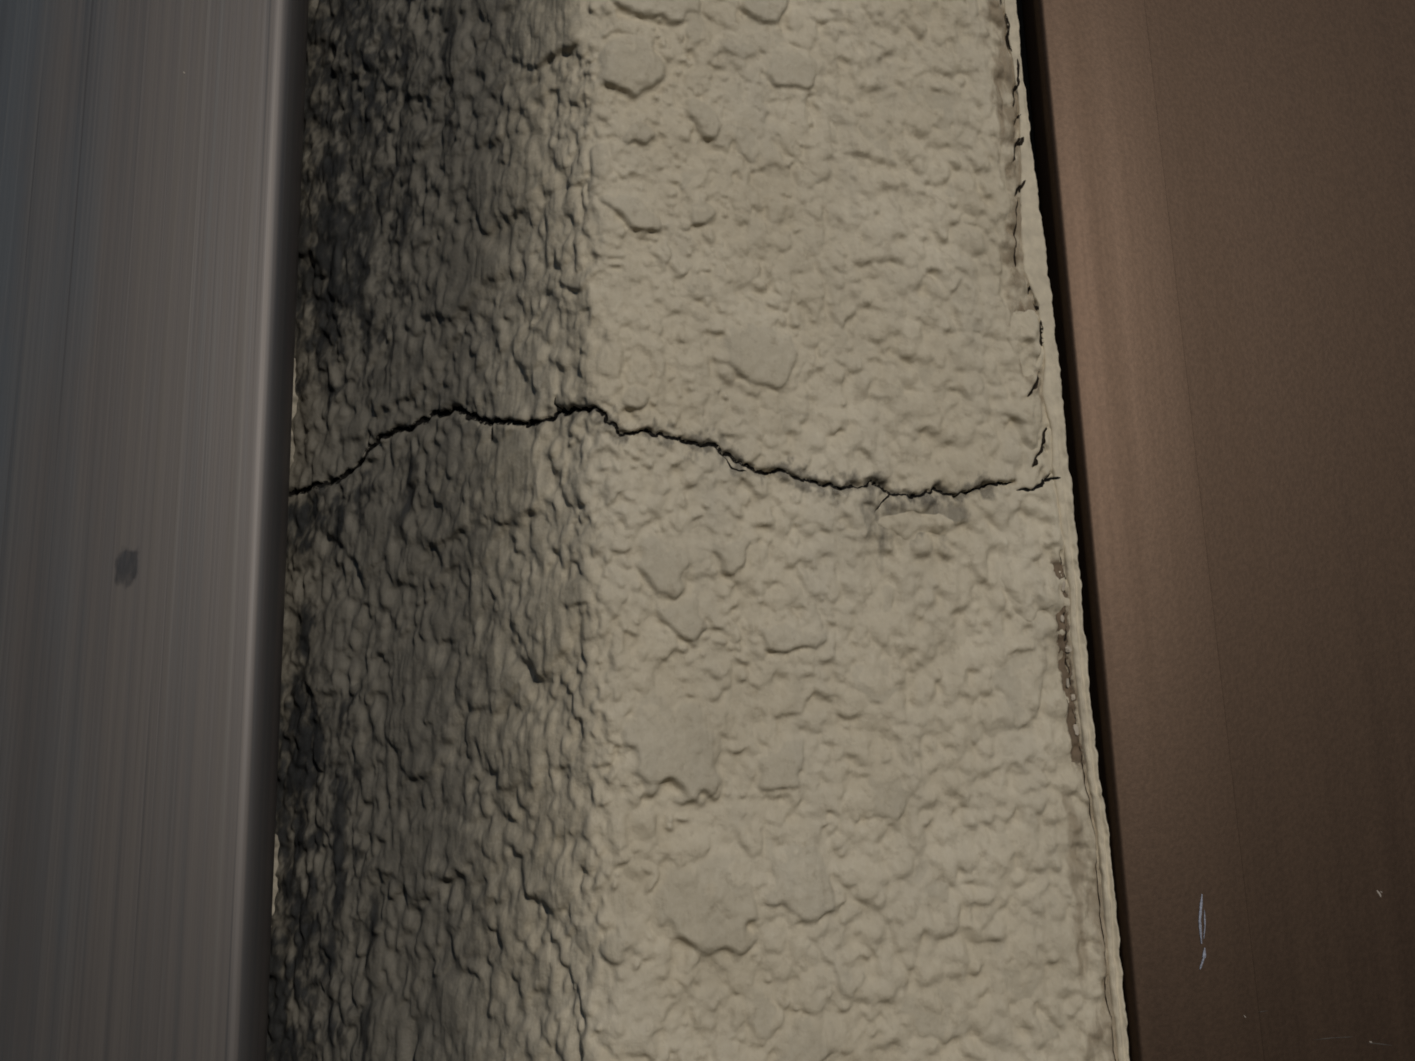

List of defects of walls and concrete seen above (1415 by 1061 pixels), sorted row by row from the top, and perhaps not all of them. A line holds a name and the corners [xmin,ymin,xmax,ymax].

crack [1001,2,1044,397]
crack [289,397,1061,513]